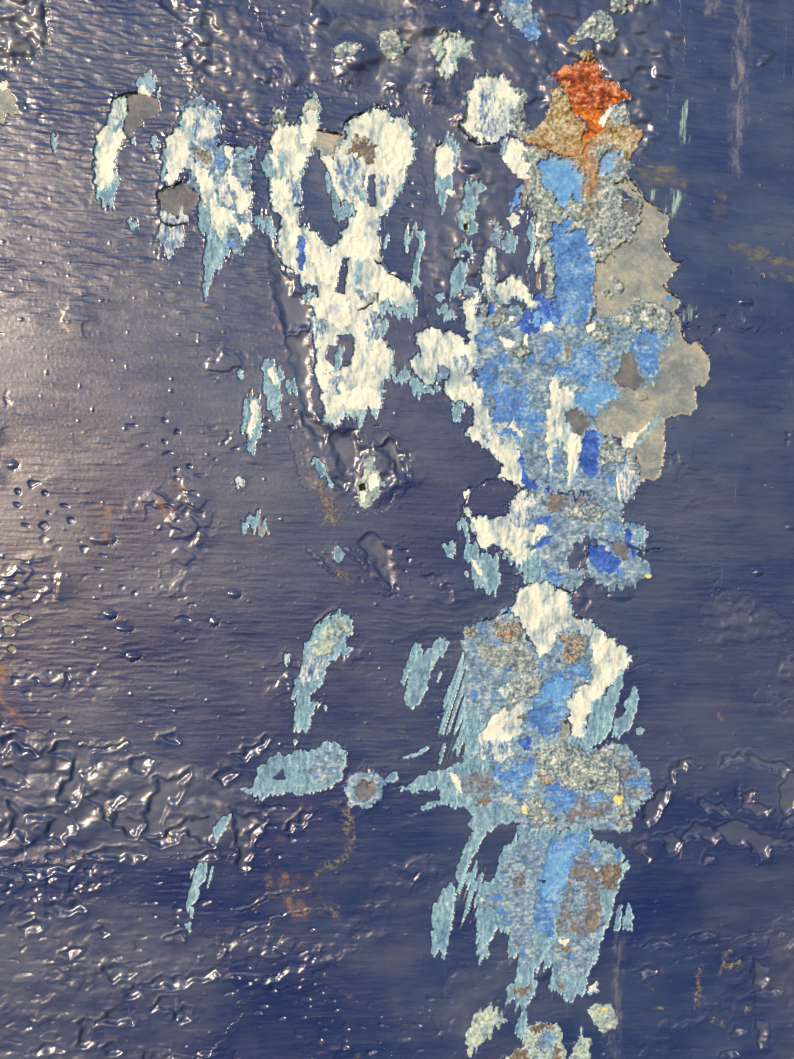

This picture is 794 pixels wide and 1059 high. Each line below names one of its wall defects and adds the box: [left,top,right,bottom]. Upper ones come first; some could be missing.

peeling [0,81,20,123]
peeling [93,70,160,208]
peeling [429,30,473,80]
rust [523,49,643,188]
peeling [150,71,794,1059]
peeling [8,741,265,939]
peeling [36,1043,62,1054]
peeling [77,964,219,1055]